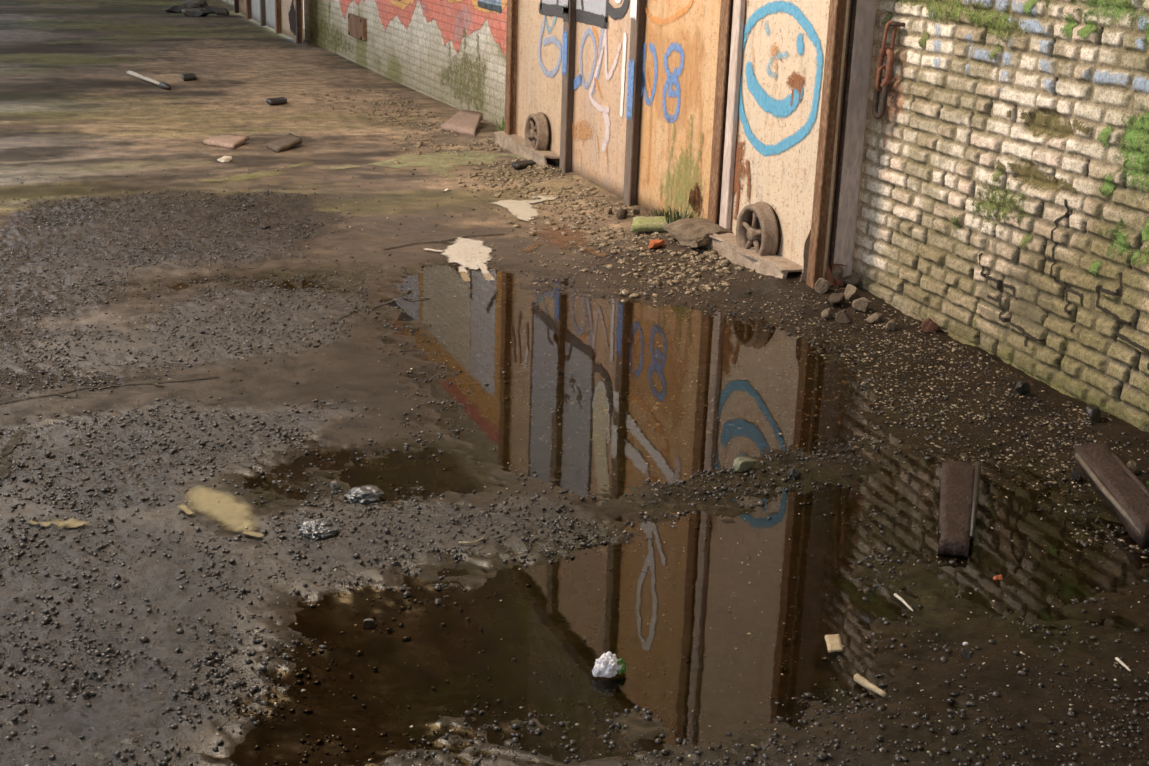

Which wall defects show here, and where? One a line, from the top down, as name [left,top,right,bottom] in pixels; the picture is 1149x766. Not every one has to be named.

rust [883,41,905,147]
crack [978,253,1045,347]
crack [1042,199,1149,371]